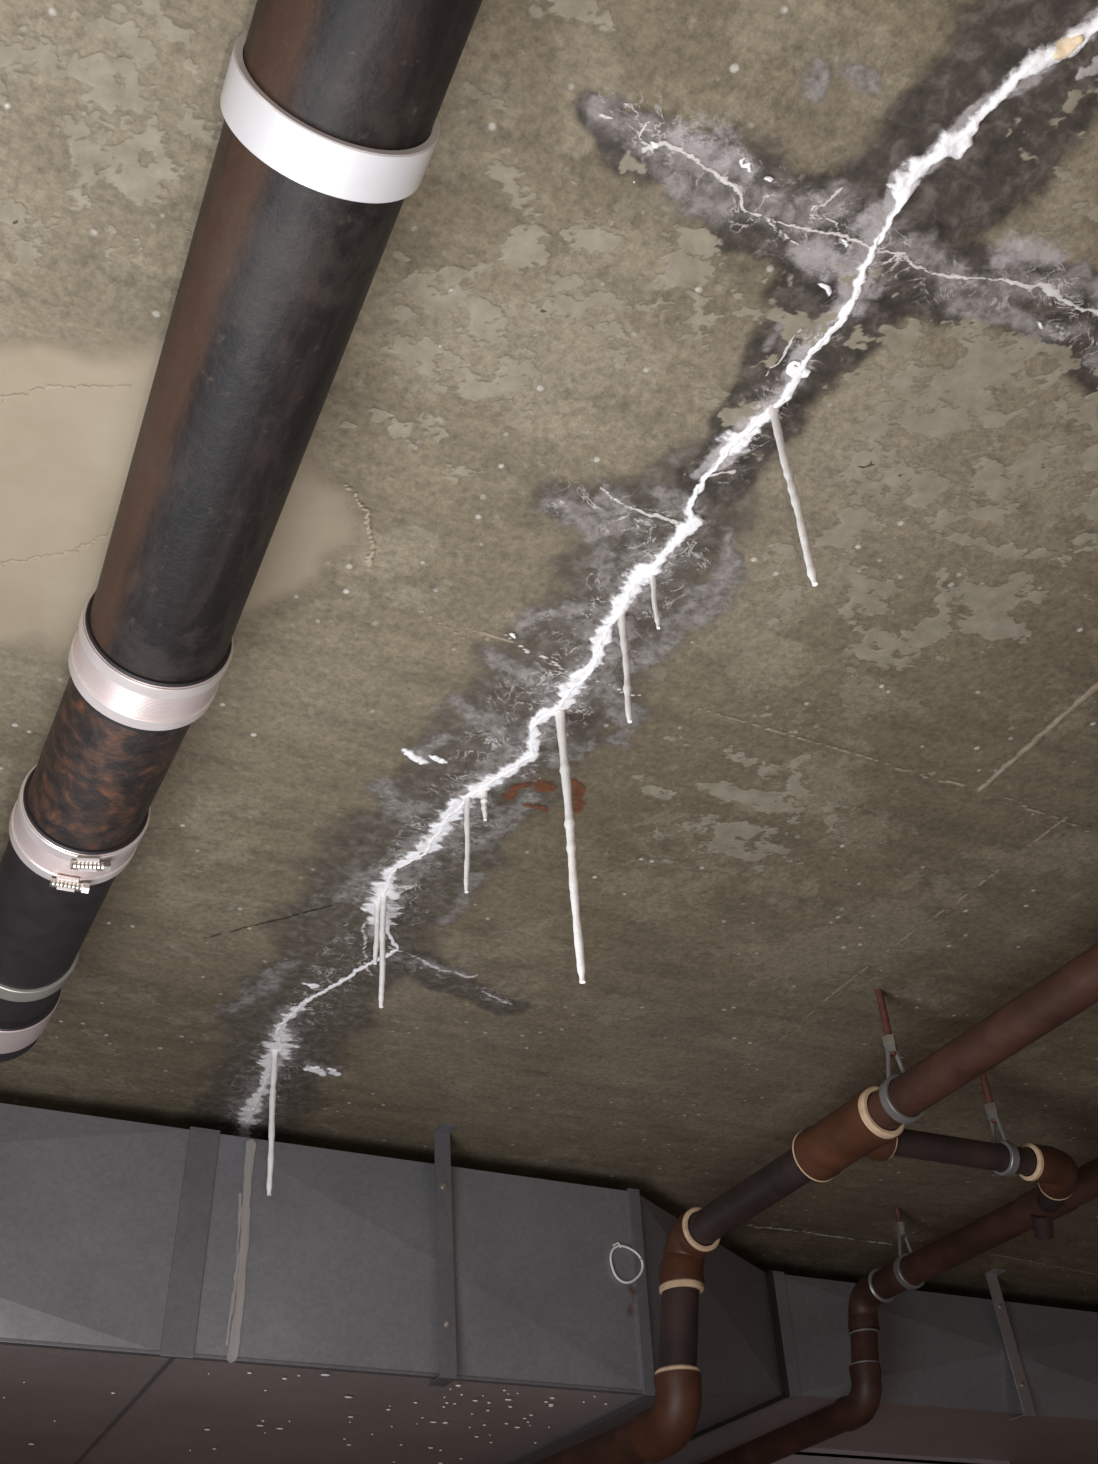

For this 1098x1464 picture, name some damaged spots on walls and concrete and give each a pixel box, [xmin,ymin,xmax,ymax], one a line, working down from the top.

rust [502,780,585,813]
damp [190,0,1098,1362]
crack [204,10,1098,1138]